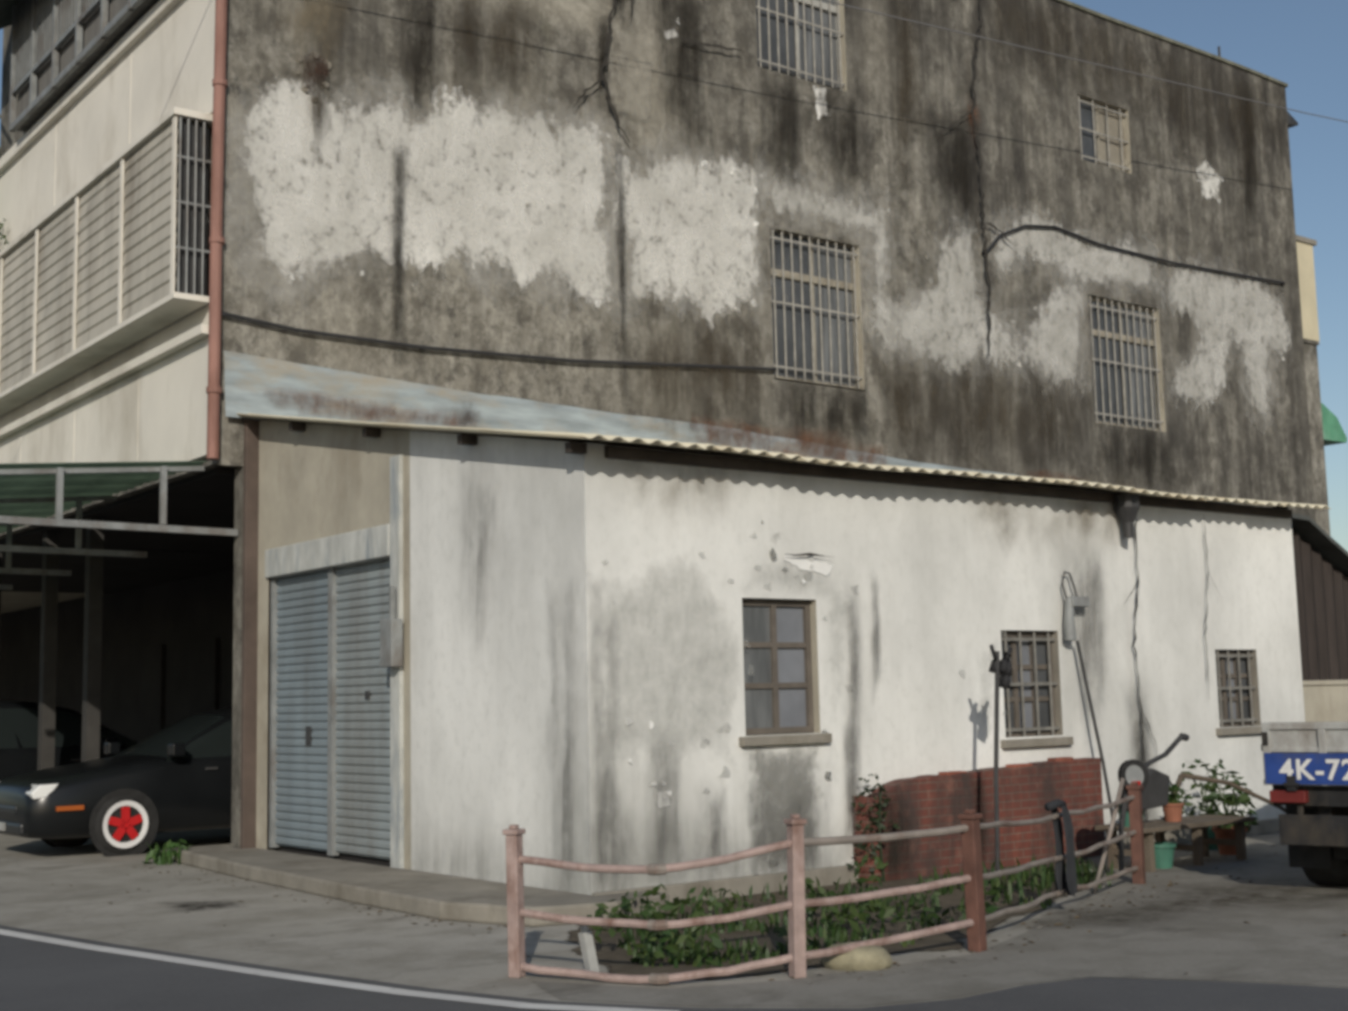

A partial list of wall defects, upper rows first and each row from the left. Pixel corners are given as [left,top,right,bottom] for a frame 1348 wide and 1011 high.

crack [572,0,633,142]
damp [599,27,607,88]
damp [670,1,696,106]
damp [393,157,402,331]
peeling [244,52,1155,385]
peeling [1196,162,1223,204]
peeling [1169,268,1291,413]
peeling [770,547,833,585]
crack [1124,517,1157,764]